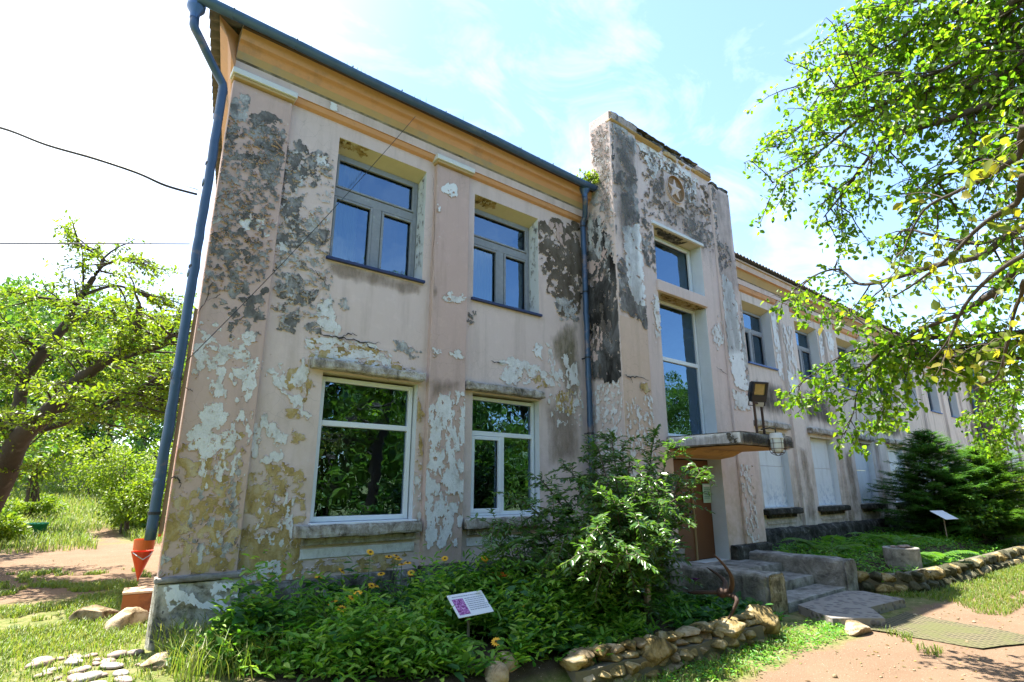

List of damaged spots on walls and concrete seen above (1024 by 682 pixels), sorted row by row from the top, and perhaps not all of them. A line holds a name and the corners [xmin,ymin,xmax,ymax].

peeling [149,92,465,644]
crack [320,333,380,351]
peeling [442,291,477,324]
peeling [499,121,752,486]